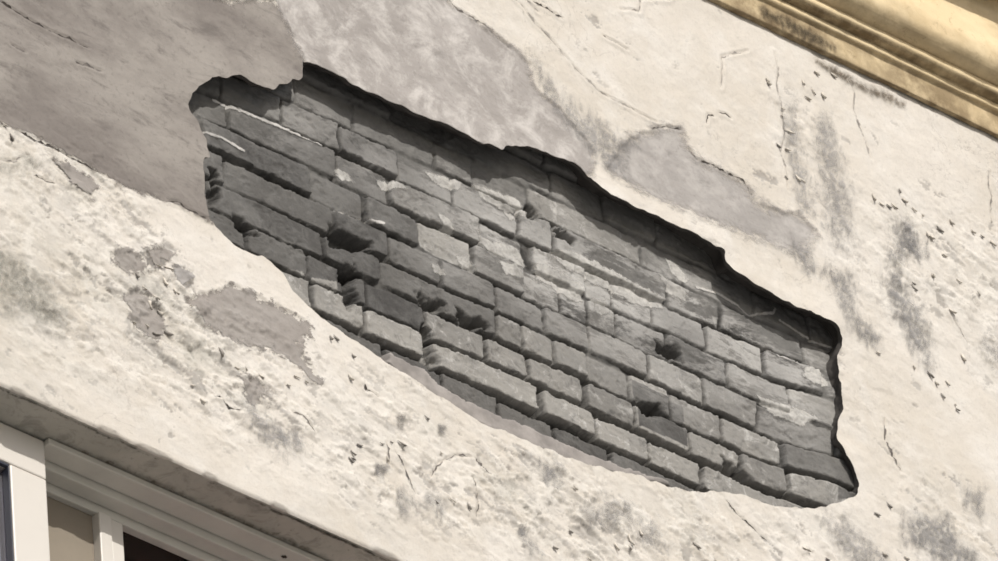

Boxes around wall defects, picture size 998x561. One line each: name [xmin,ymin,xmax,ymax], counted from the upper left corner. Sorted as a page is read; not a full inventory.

water stain [763,9,835,49]
crack [516,0,682,130]
water stain [816,61,904,105]
crack [691,153,748,188]
spalling [0,0,859,509]